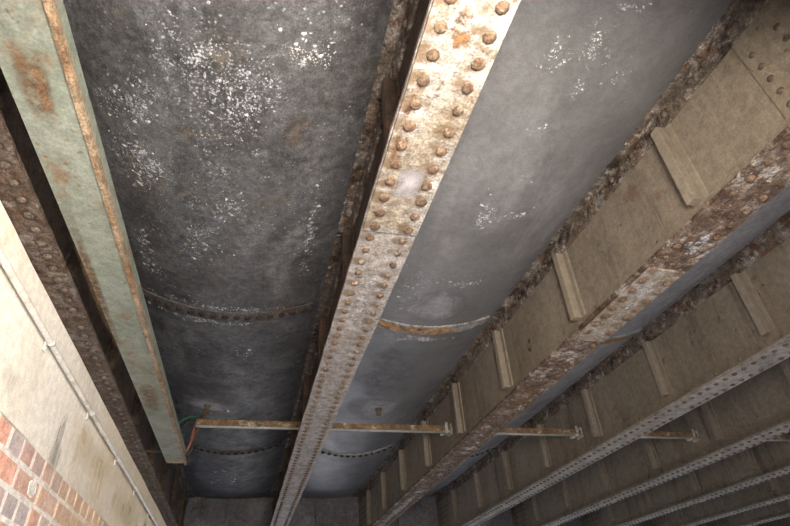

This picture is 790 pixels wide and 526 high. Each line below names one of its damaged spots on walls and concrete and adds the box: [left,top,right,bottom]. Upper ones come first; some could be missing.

rust [17,63,53,113]
rust [622,108,667,166]
rust [377,320,459,334]